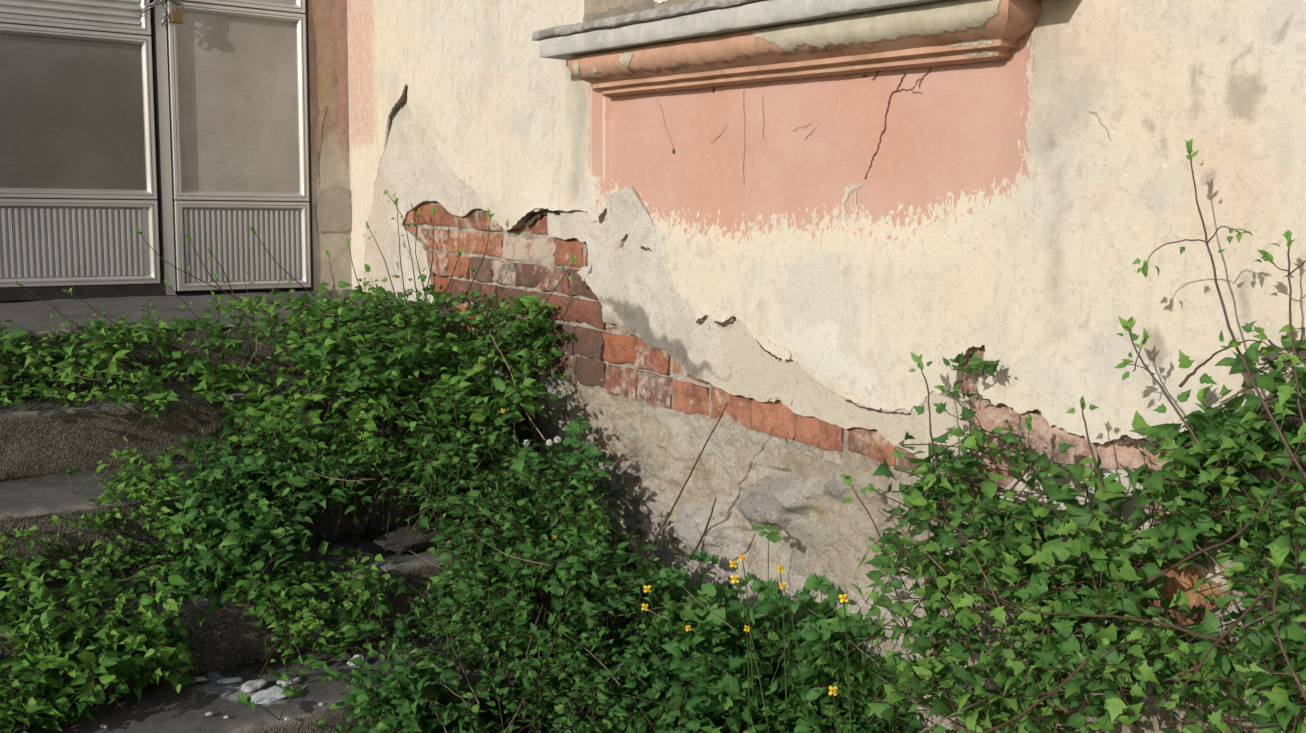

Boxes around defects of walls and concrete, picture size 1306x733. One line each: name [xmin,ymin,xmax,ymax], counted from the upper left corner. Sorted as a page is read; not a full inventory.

peeling [752,0,1000,58]
crack [855,67,931,213]
flaking render [362,99,1177,529]
flaking render [1245,448,1306,522]
flaking render [946,514,988,556]